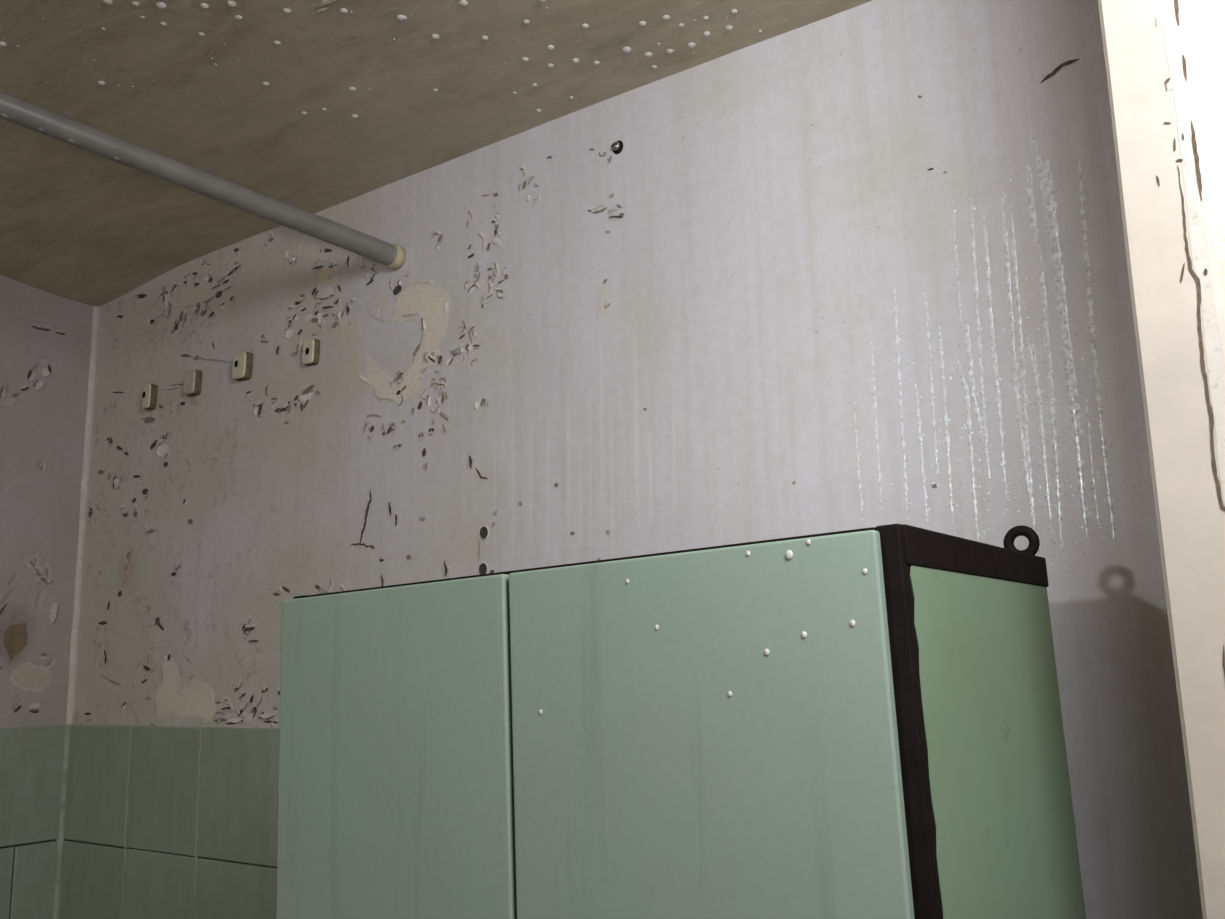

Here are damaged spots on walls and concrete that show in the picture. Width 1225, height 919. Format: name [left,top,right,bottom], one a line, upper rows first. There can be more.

crack [1157,0,1179,27]
crack [1041,59,1079,83]
crack [1164,55,1187,91]
peeling [464,189,508,309]
crack [1156,121,1225,510]
peeling [260,246,480,473]
leakage [870,127,1120,587]
peeling [244,382,320,428]
peeling [142,654,280,729]
crack [1217,645,1225,676]